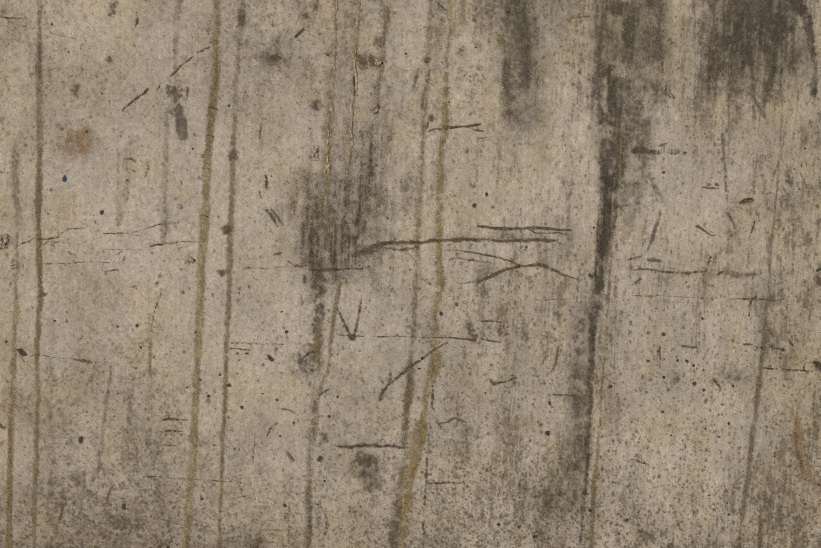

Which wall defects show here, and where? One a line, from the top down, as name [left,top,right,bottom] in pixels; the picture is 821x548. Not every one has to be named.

leakage [502,0,537,118]
leakage [702,0,816,108]
leakage [298,143,375,374]
leakage [572,0,664,548]